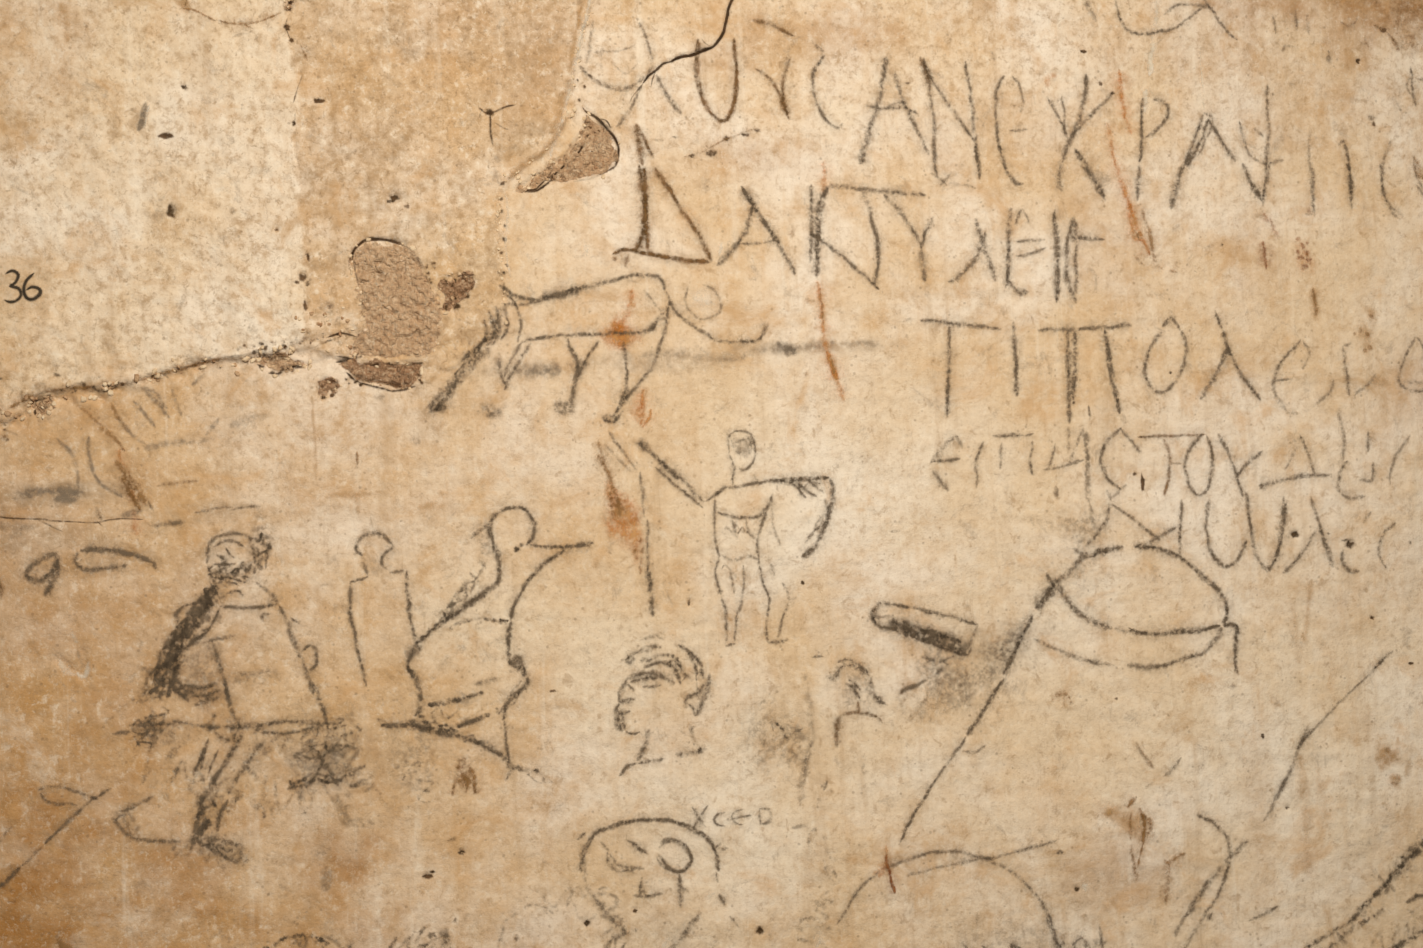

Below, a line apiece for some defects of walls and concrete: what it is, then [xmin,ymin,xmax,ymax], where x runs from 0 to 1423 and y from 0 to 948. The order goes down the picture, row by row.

crack [643,0,733,83]
flaking render [495,0,621,303]
flaking render [0,238,475,430]